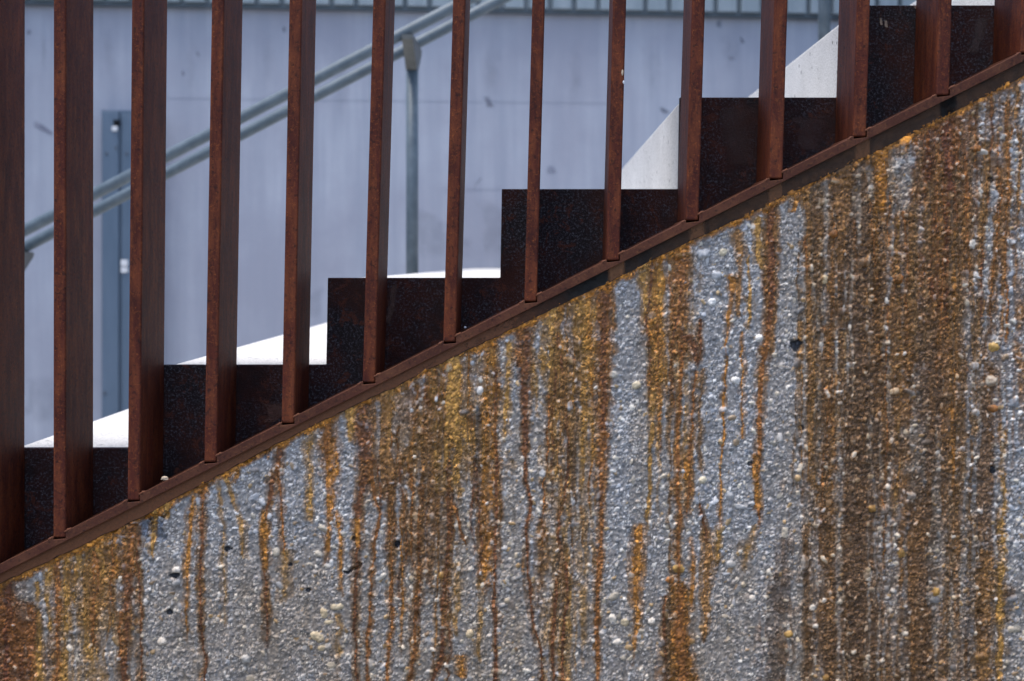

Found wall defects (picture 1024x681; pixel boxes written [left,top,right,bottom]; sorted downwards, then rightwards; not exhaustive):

corrosion [977,96,995,293]
corrosion [987,83,1022,324]
corrosion [724,228,747,347]
corrosion [183,495,197,632]
corrosion [385,604,395,681]
corrosion [431,602,452,681]
corrosion [630,524,646,650]
corrosion [699,503,722,643]
corrosion [719,356,728,518]
corrosion [802,526,843,681]
corrosion [892,464,938,681]
corrosion [973,330,1007,681]